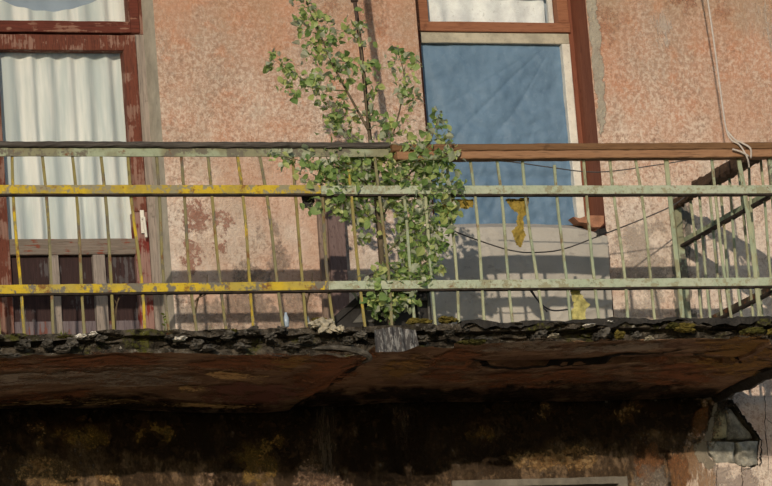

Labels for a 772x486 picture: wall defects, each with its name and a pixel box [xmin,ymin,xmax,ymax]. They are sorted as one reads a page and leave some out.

flaking render [586,0,606,134]
spalling [0,331,108,358]
spalling [164,326,288,352]
spalling [281,317,368,350]
spalling [530,321,564,341]
spalling [582,320,614,341]
crack [471,345,742,370]
leakage [0,397,733,486]
flaking render [693,399,760,486]
crack [730,384,770,486]